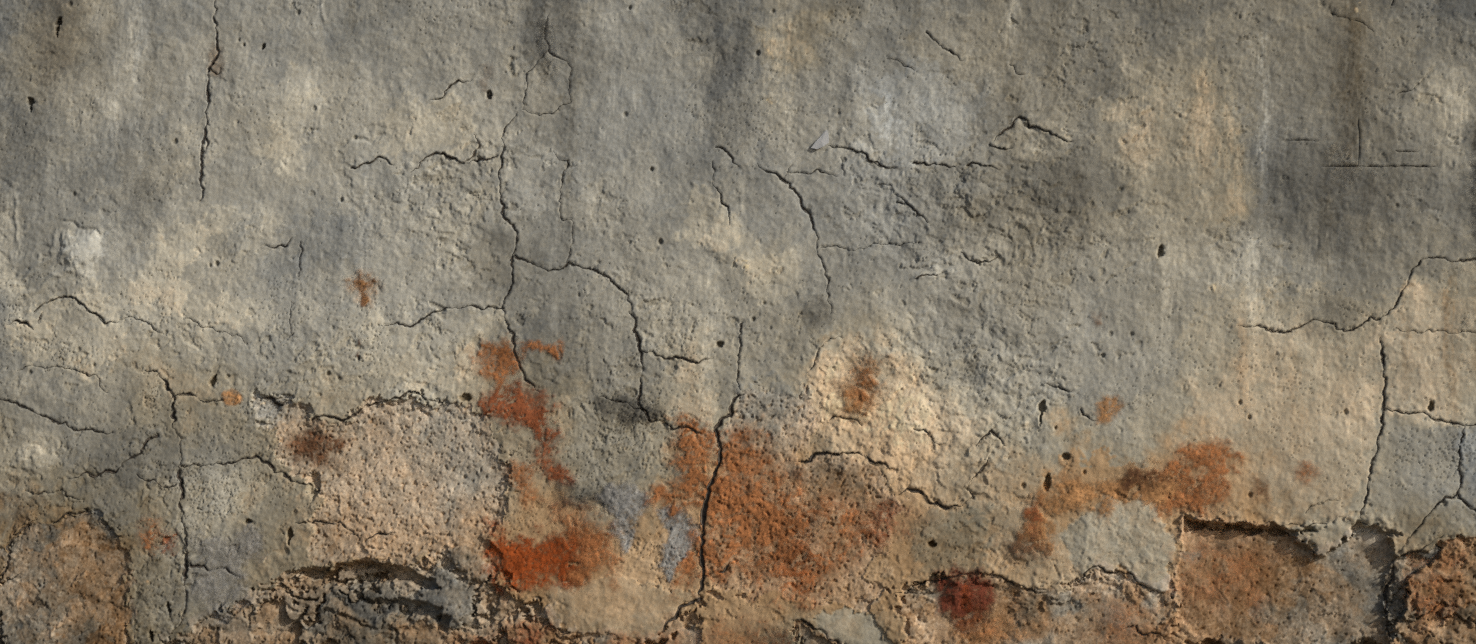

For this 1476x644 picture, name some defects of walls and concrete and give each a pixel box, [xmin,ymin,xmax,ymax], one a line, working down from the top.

spalling [0,509,232,644]
crack [1,365,308,627]
corrosion [354,278,376,307]
crack [351,15,744,634]
corrosion [477,340,621,592]
corrosion [646,414,893,608]
crack [712,117,1070,373]
crack [795,416,1002,510]
corrosion [937,568,1027,644]
flaking render [544,117,1476,644]
corrosion [1010,442,1244,558]
crack [1242,256,1476,642]